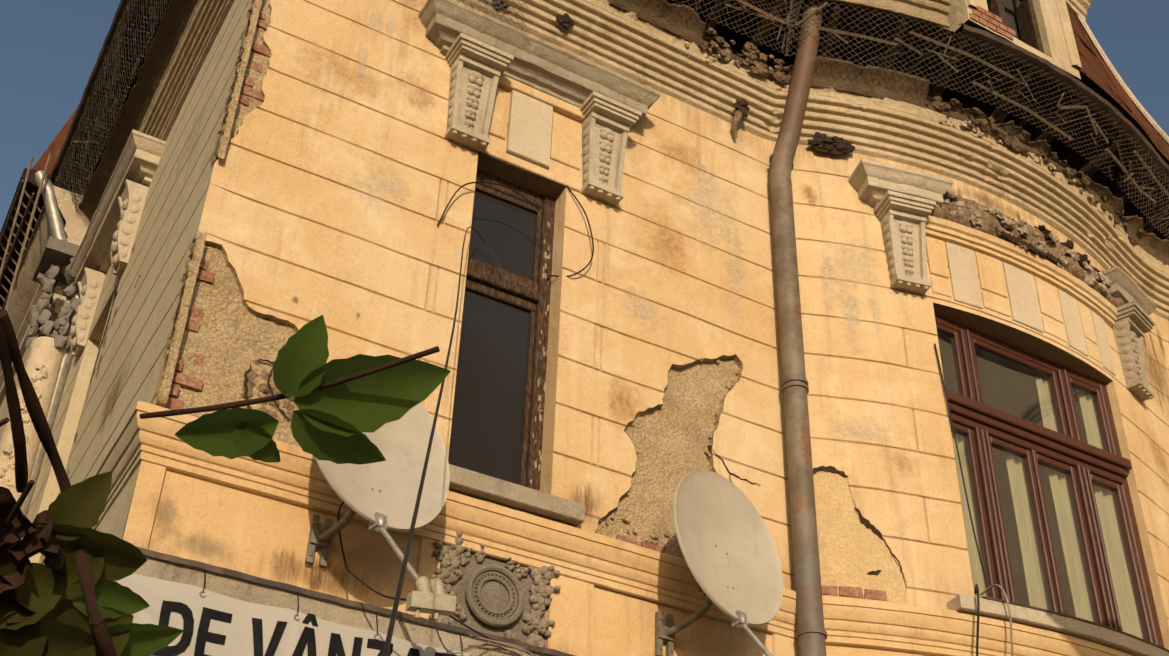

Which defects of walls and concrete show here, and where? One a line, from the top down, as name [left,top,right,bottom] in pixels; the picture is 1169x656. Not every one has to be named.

flaking render [150,231,300,447]
flaking render [933,194,1124,307]
flaking render [595,354,743,559]